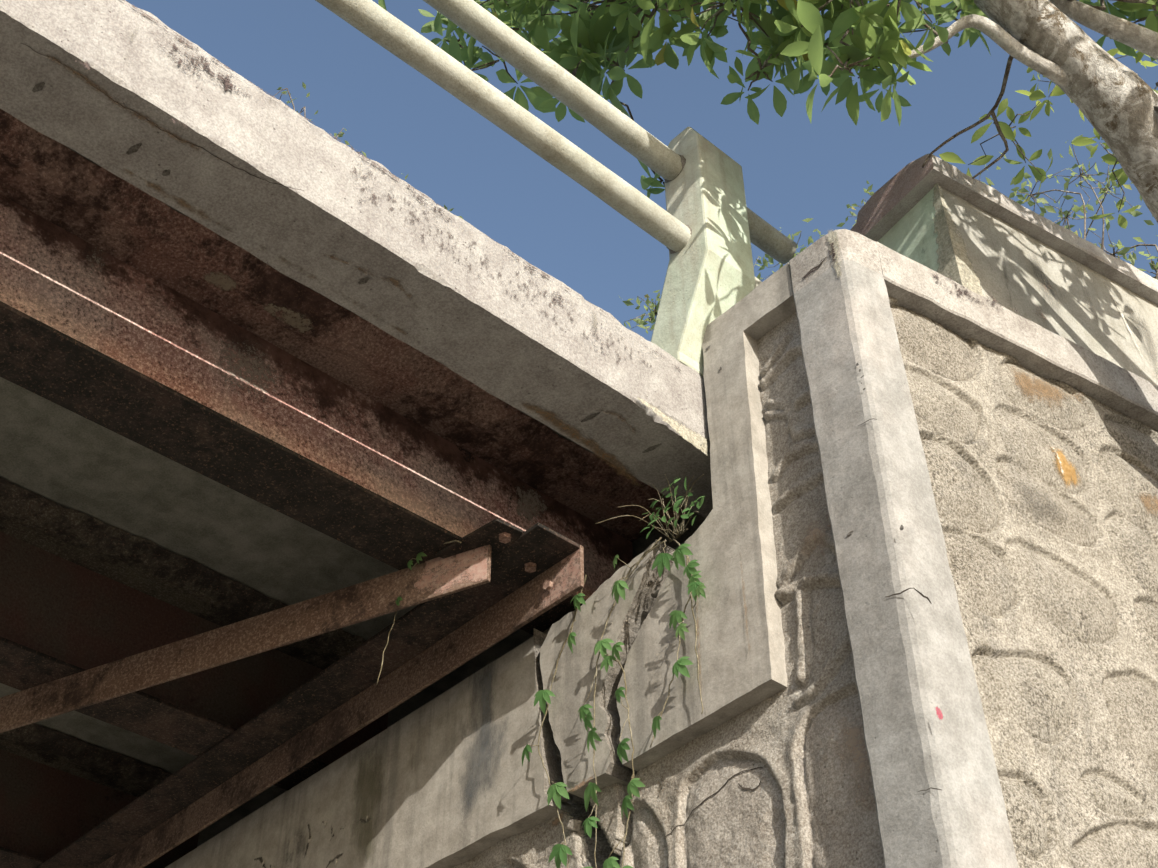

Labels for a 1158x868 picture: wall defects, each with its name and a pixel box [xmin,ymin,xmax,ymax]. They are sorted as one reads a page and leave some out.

crack [22,43,304,191]
rust [1056,451,1077,484]
crack [640,547,674,627]
crack [886,588,932,604]
damp [464,668,502,809]
crack [561,795,632,868]
crack [665,767,763,837]